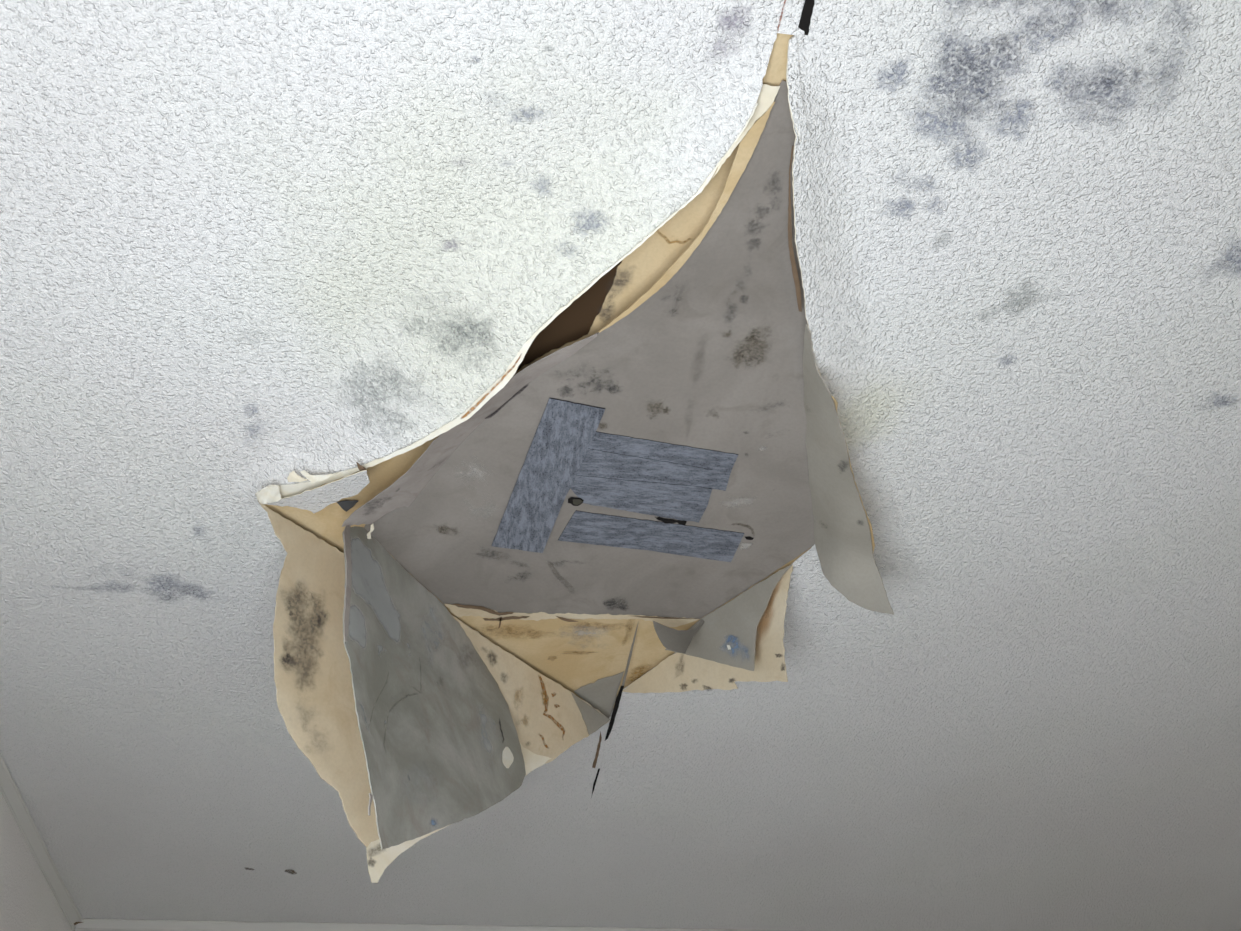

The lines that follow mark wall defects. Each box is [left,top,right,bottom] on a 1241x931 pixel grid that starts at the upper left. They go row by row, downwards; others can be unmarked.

crack [798,0,814,35]
damp [927,48,1002,133]
damp [283,591,321,676]